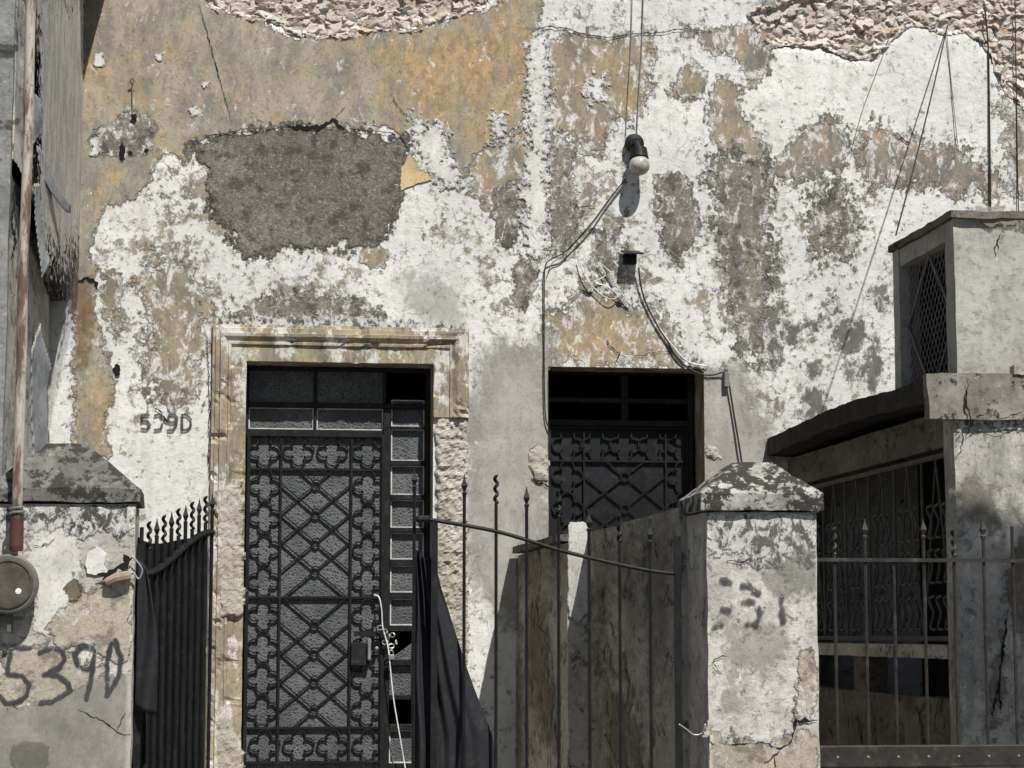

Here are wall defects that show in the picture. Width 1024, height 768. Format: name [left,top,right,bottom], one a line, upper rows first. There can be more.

crack [200,9,416,151]
peeling [12,0,1024,459]
mould [760,276,894,421]
crack [965,381,1024,438]
spalling [434,417,470,664]
peeling [0,527,136,709]
peeling [703,645,820,768]
crack [730,709,818,767]
crack [991,609,1009,719]